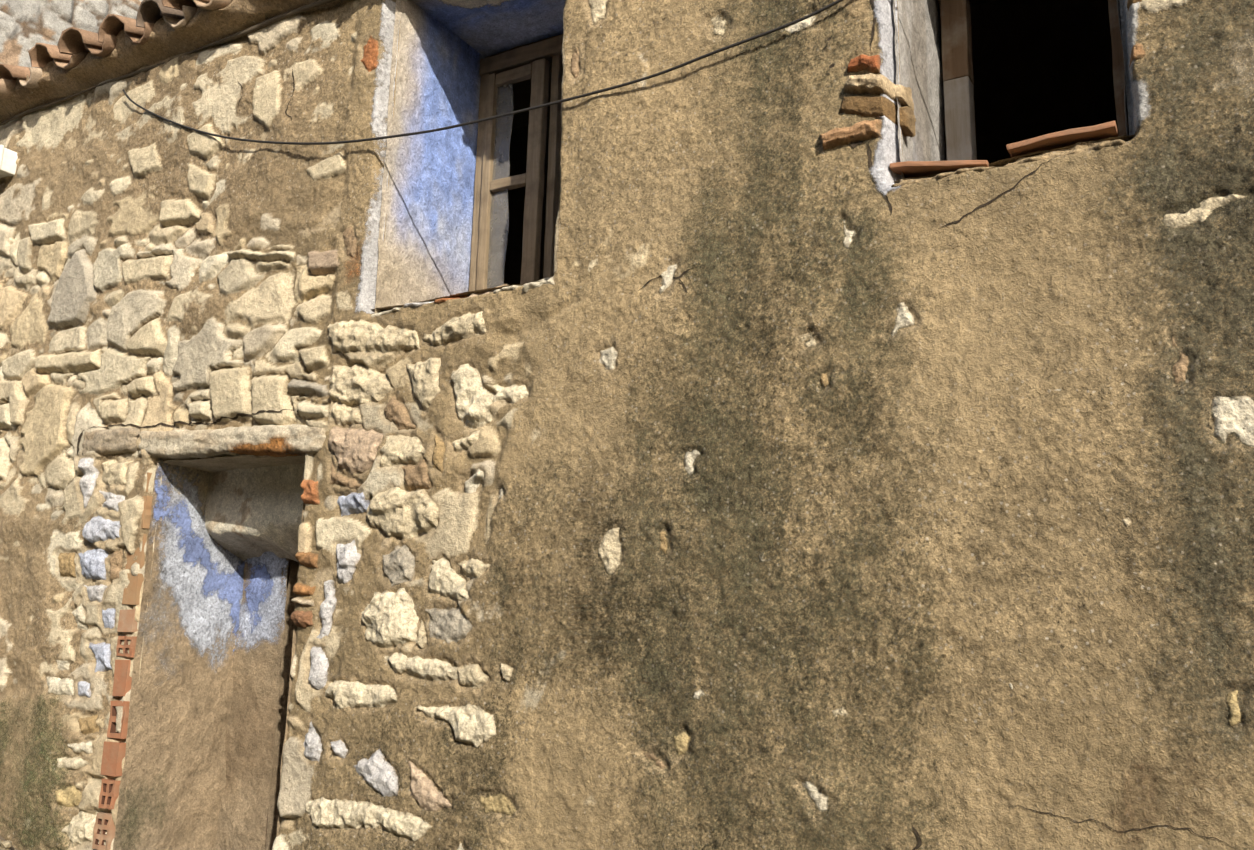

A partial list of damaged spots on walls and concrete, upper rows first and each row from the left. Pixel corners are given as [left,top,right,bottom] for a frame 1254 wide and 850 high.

flaking render [820,0,916,195]
crack [942,157,1056,227]
spalling [1163,194,1247,228]
crack [77,409,299,455]
spalling [308,0,529,709]
leakage [354,0,954,850]
leakage [1093,0,1254,778]
spalling [1211,395,1254,447]
peeling [46,457,134,698]
peeling [153,464,288,666]
spalling [304,721,452,841]
spalling [415,704,496,748]